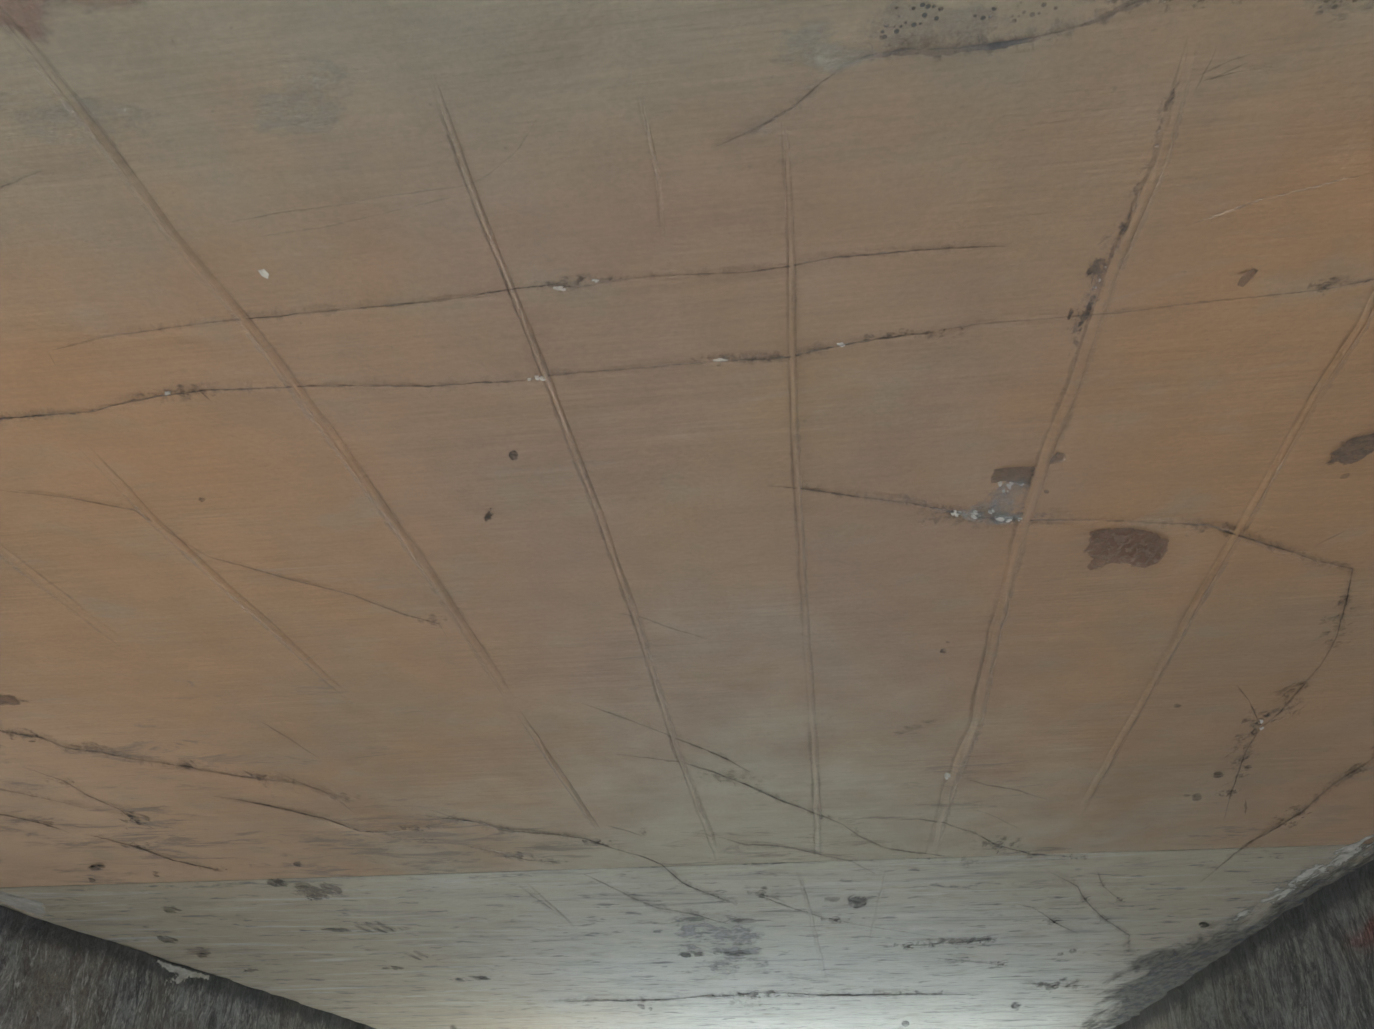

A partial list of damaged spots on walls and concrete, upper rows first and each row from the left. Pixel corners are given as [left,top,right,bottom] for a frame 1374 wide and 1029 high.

spalling [881,3,943,39]
crack [981,39,1022,50]
crack [490,279,599,293]
crack [713,333,928,361]
crack [393,376,546,387]
crack [0,389,239,419]
damp [1328,433,1374,465]
spalling [963,466,1035,524]
crack [921,505,1050,522]
damp [1084,528,1169,570]
crack [1227,689,1269,795]
crack [582,919,937,1002]